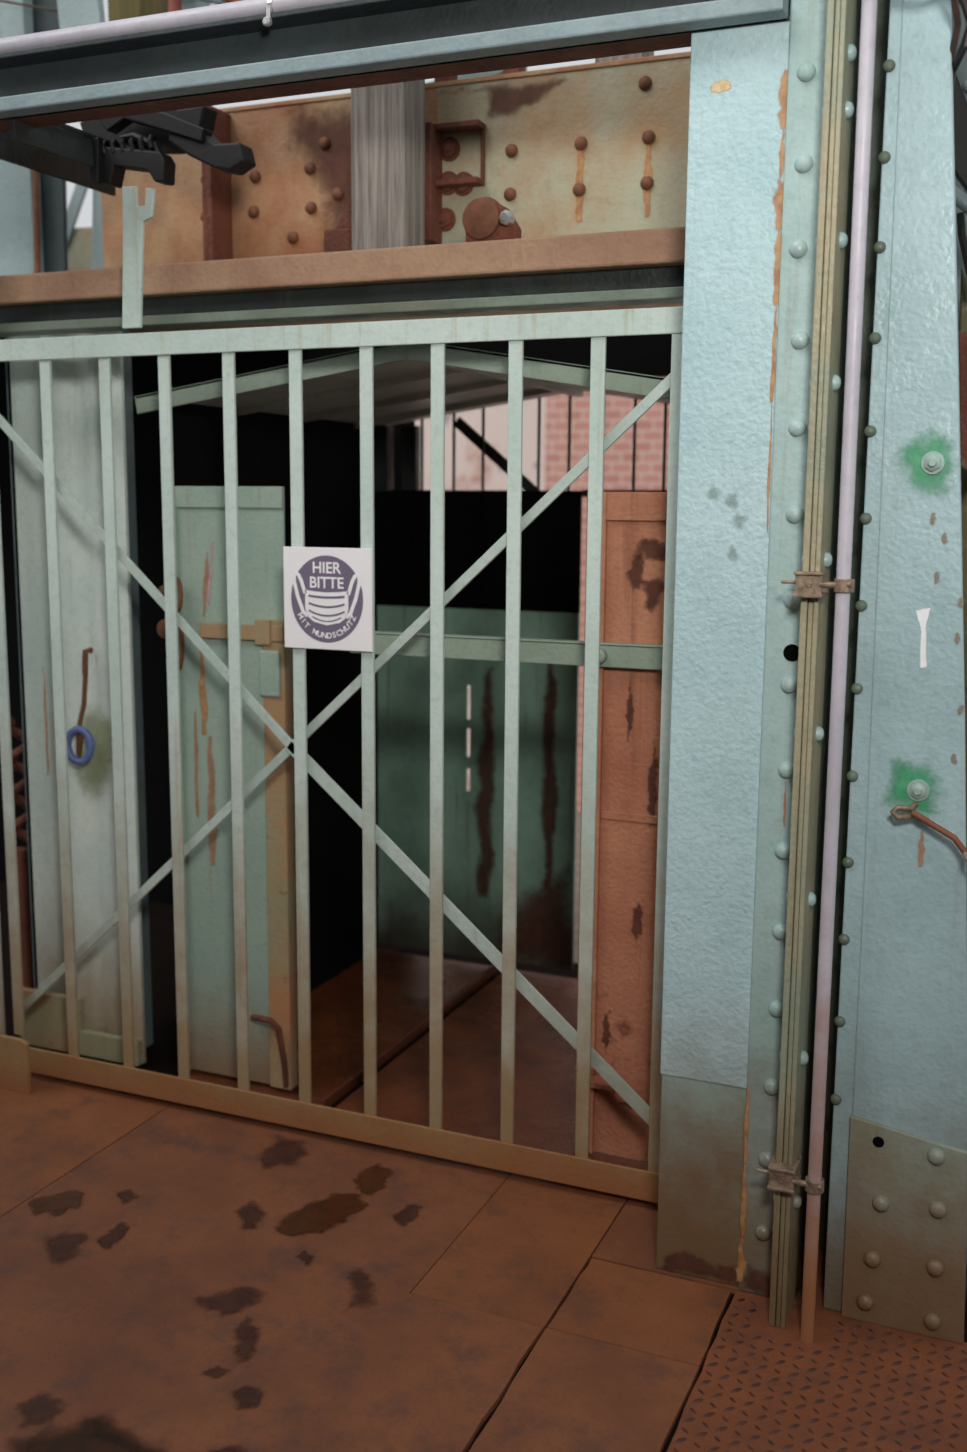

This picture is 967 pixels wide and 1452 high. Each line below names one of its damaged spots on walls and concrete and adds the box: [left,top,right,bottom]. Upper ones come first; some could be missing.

rust [490,82,558,114]
rust [295,114,351,224]
rust [767,70,788,532]
rust [628,539,666,609]
rust [476,673,495,896]
rust [502,664,569,960]
damp [260,1139,305,1168]
damp [29,1190,83,1216]
damp [46,1222,129,1261]
damp [276,1164,392,1265]
damp [198,1287,260,1378]
damp [234,1386,262,1409]